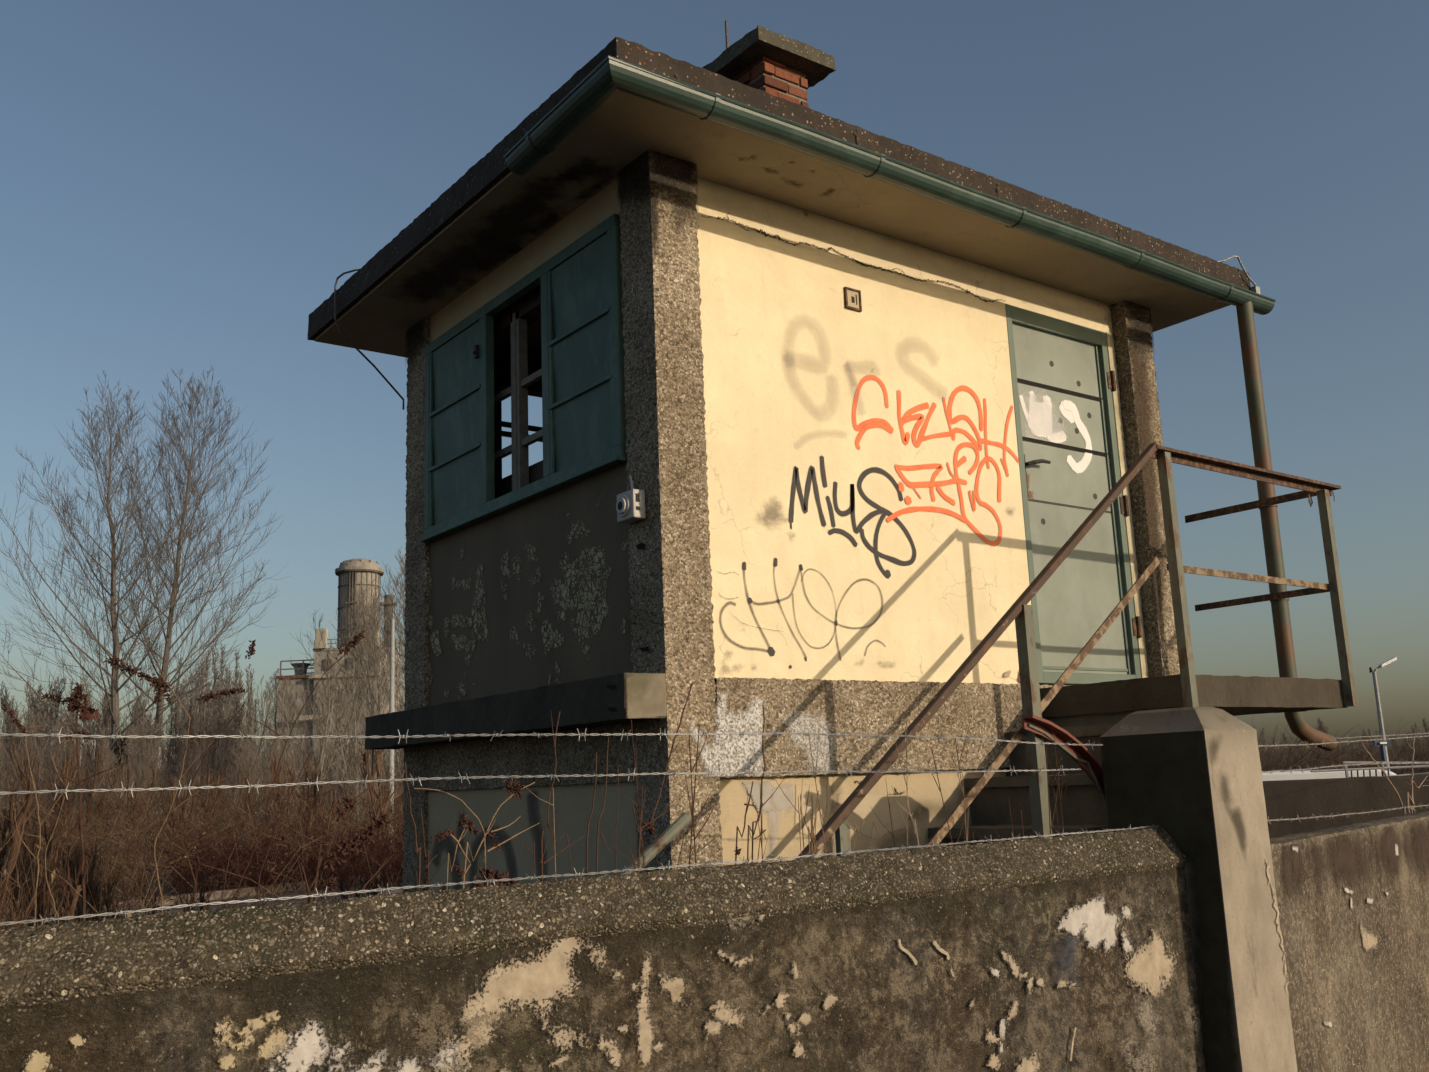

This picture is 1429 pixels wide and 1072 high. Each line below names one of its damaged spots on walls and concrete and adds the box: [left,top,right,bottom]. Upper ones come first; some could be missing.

damp [403,149,696,300]
crack [701,213,1001,303]
peeling [428,489,627,698]
flaking render [214,935,688,1072]
flaking render [715,944,756,974]
flaking render [728,914,765,930]
flaking render [703,957,838,1060]
flaking render [985,950,1077,1072]
flaking render [1055,895,1200,1072]